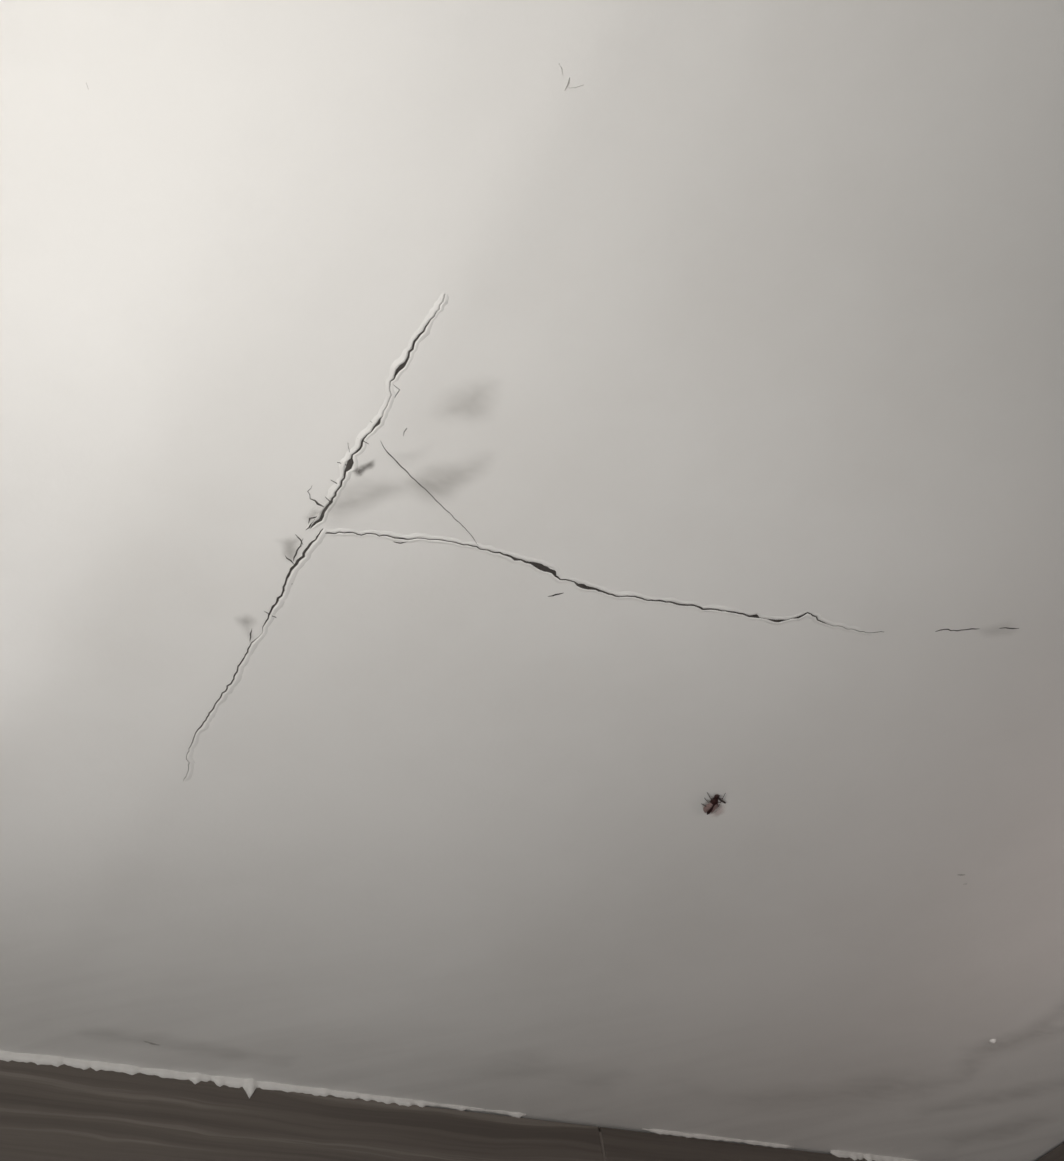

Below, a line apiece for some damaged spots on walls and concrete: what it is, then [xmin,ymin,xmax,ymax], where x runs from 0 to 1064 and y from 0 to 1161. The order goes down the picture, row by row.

crack [183,293,885,781]
crack [935,625,1019,633]